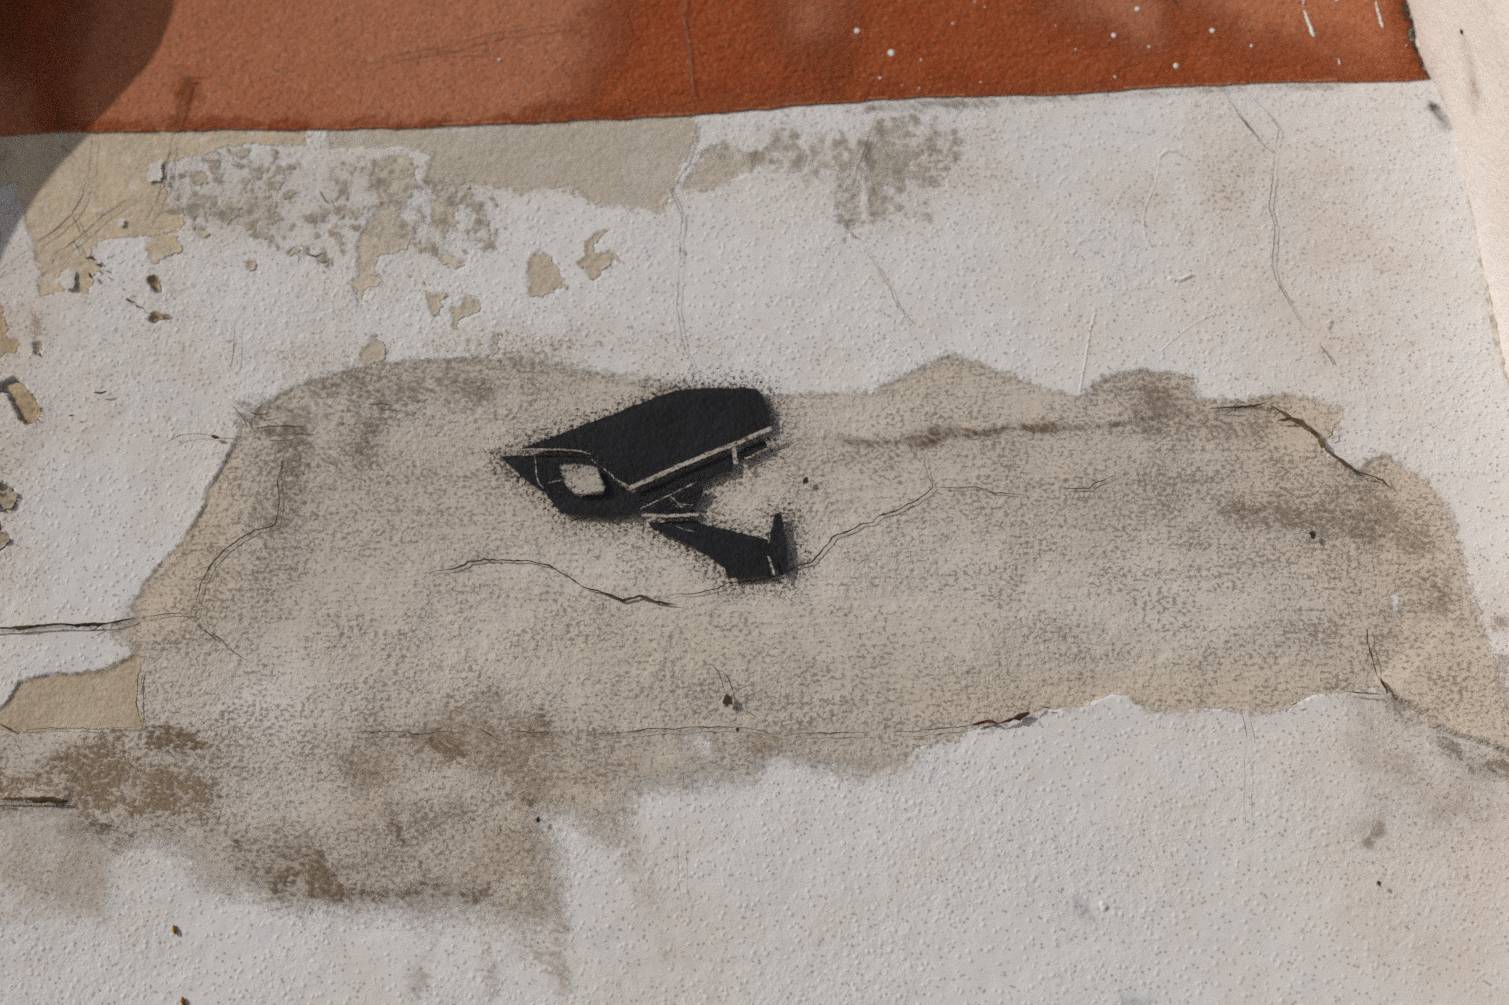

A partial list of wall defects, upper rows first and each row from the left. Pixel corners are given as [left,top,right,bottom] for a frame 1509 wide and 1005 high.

peeling [0,105,961,311]
peeling [0,305,41,356]
flaking render [149,310,170,322]
peeling [408,274,480,329]
crack [1065,475,1115,489]
crack [0,408,307,658]
crack [427,453,1020,605]
peeling [0,332,1509,927]
crack [0,667,143,730]
crack [0,796,67,807]